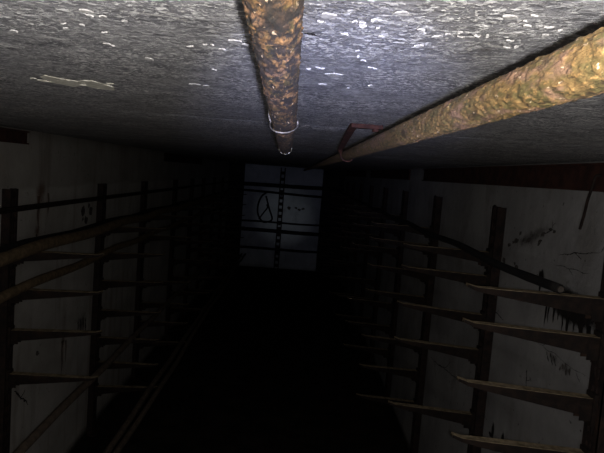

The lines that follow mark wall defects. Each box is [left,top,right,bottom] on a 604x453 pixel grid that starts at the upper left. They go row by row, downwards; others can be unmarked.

peeling [30,75,115,91]
water stain [544,306,595,334]